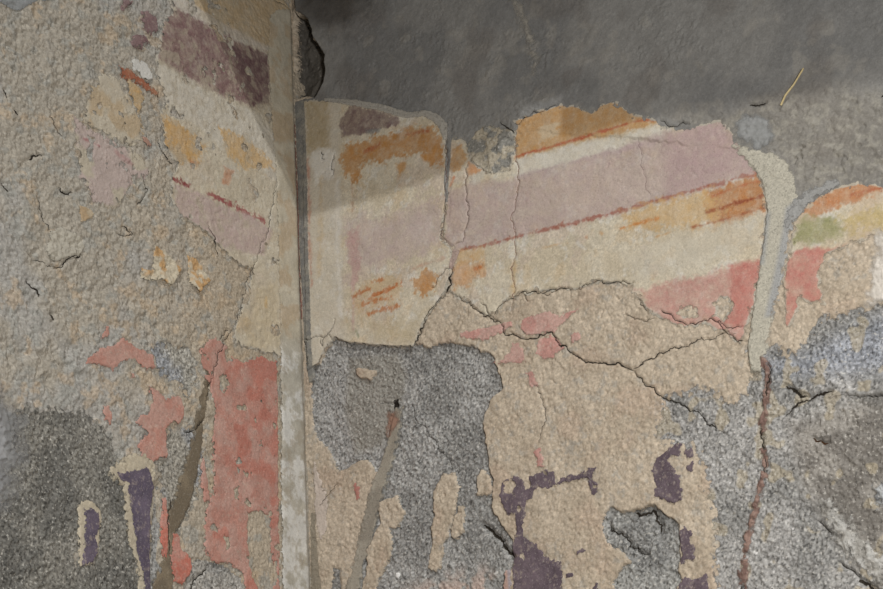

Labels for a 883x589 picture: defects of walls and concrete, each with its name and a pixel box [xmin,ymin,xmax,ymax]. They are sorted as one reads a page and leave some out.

peeling [73,11,159,221]
peeling [140,246,211,292]
spalling [467,125,517,173]
crack [415,105,832,433]
spalling [0,326,281,589]
spalling [311,309,598,589]
spalling [602,303,883,589]